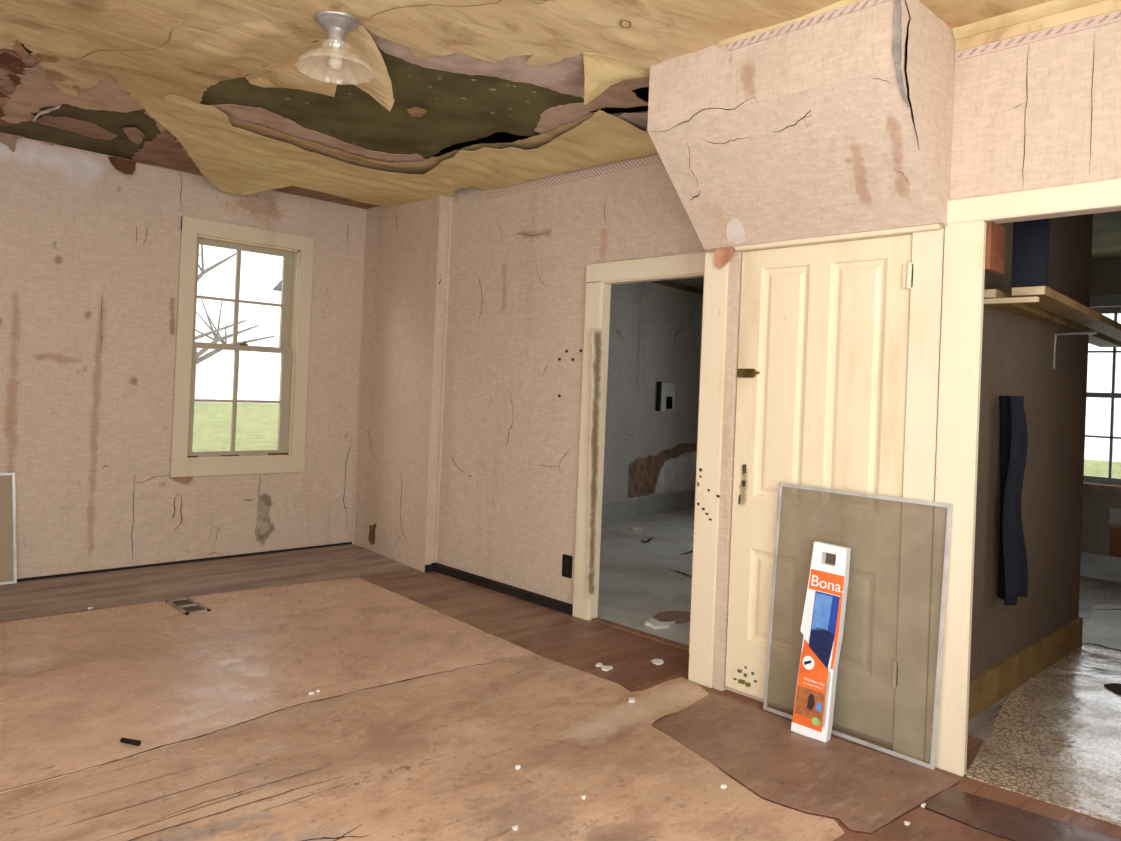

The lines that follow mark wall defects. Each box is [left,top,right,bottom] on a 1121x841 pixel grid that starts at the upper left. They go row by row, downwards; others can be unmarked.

crack [1014,51,1052,174]
crack [1088,36,1096,172]
flaking render [0,138,110,197]
crack [649,97,756,200]
flaking render [255,493,275,547]
flaking render [655,451,720,521]
spalling [737,461,750,509]